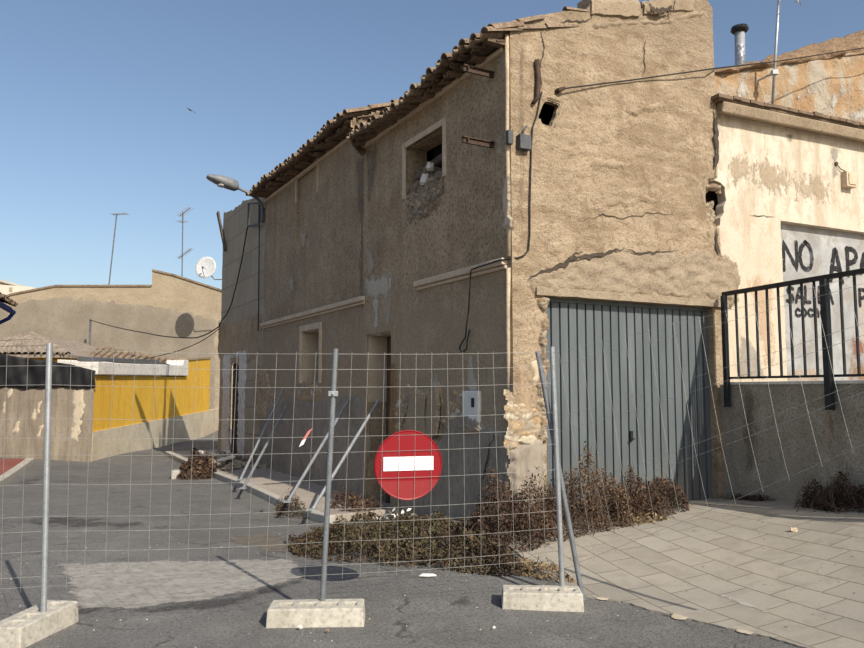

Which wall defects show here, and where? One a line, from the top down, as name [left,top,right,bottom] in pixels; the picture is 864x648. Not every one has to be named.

hole [546,95,565,128]
crack [584,212,678,221]
spalling [701,153,831,246]
crack [529,248,677,279]
peeling [71,388,85,442]
flaking render [394,383,462,445]